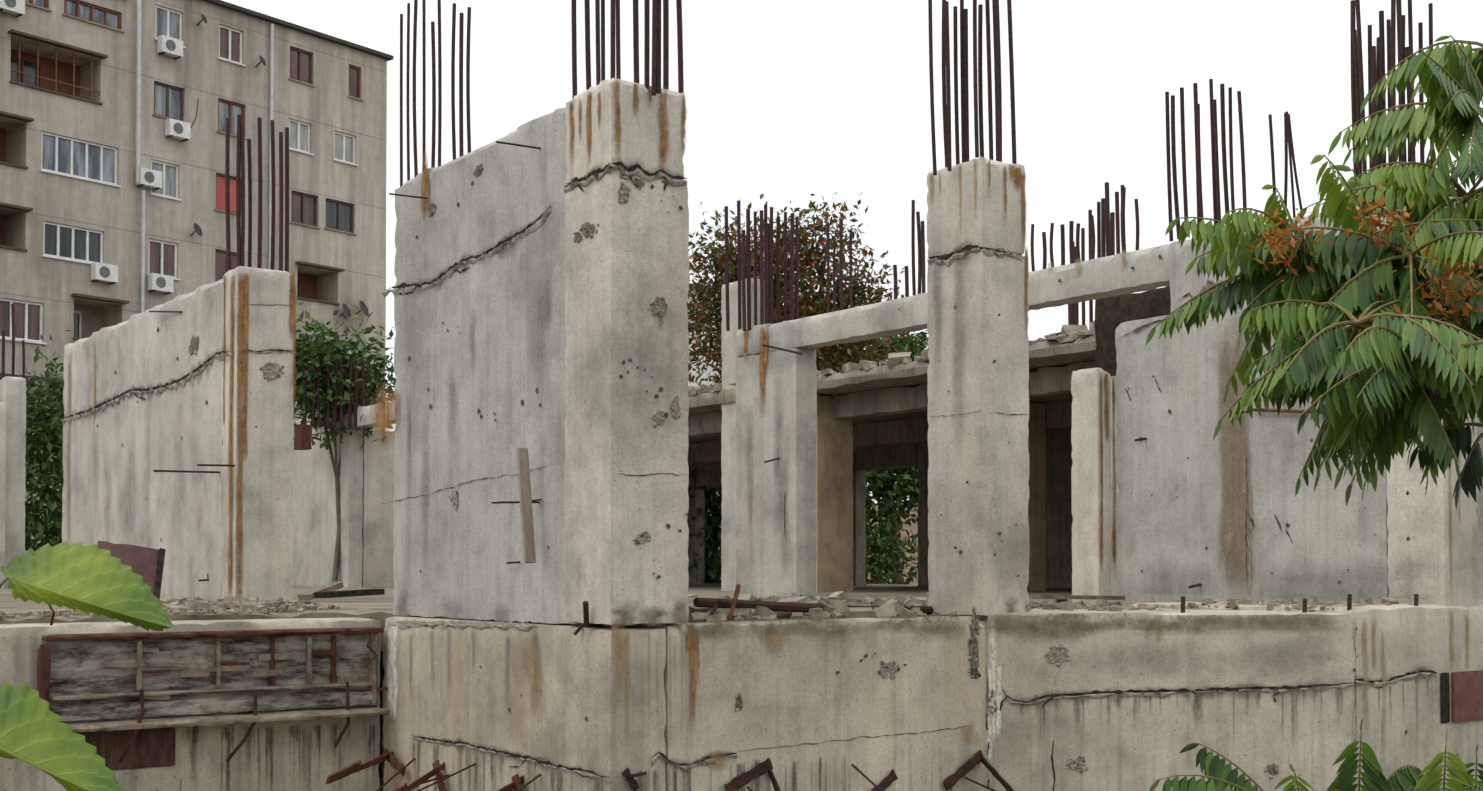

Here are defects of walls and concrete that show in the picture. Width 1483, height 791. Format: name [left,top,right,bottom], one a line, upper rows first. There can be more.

rust [569,80,687,165]
crack [382,162,688,297]
crack [927,245,1023,266]
rust [959,160,1028,330]
rust [223,275,249,594]
crack [381,730,610,791]
rust [686,624,699,709]
crack [651,619,1437,791]